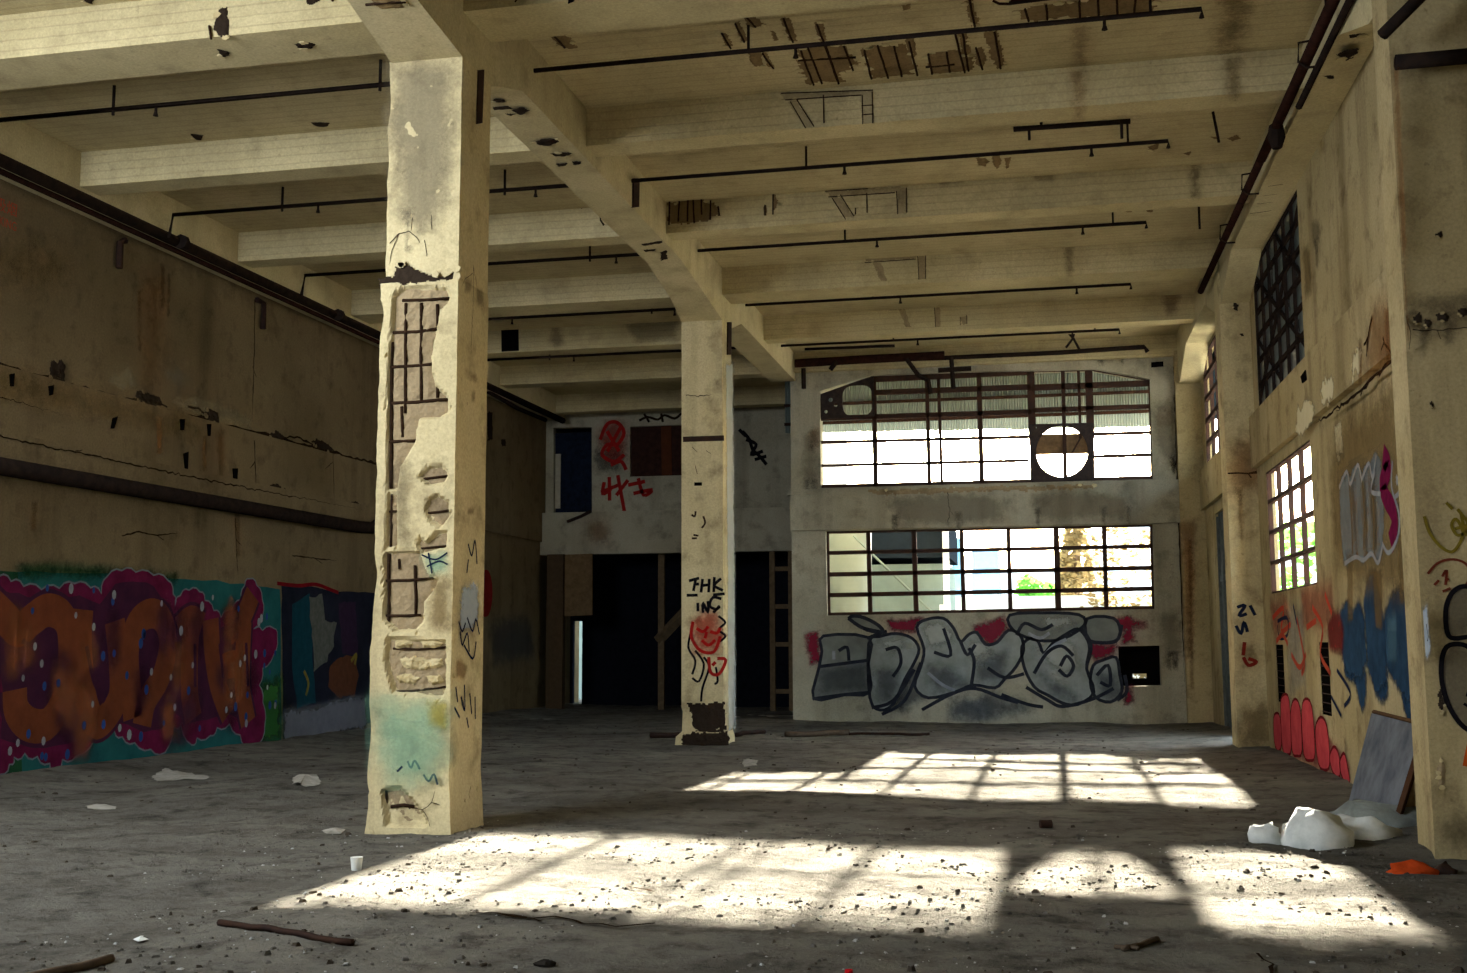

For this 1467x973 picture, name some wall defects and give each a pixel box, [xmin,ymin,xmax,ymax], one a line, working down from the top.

spalling [721,0,1008,128]
spalling [641,199,723,261]
spalling [378,260,461,695]
crack [1256,953,1274,973]